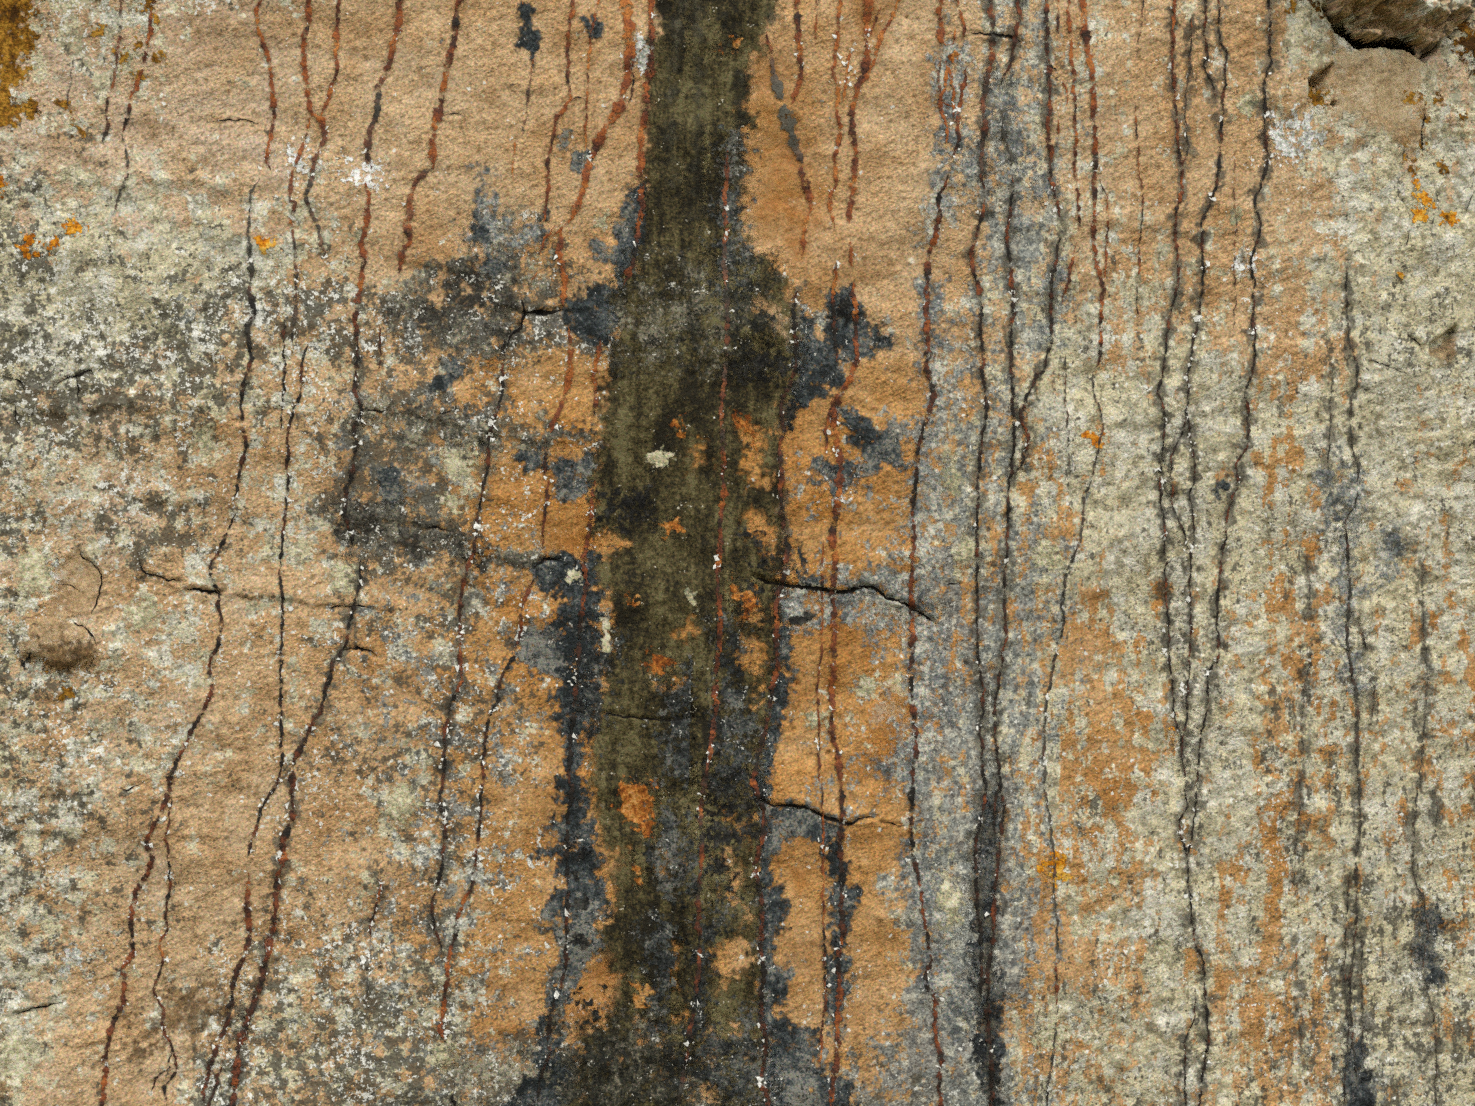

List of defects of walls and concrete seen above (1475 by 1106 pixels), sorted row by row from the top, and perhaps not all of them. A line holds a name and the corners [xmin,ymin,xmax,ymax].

rust [398,0,462,274]
rust [532,0,656,306]
rust [766,0,900,255]
rust [540,329,602,548]
crack [60,550,102,643]
crack [140,564,249,599]
crack [345,645,373,653]
leakage [124,0,1072,1106]
rust [814,242,862,1106]
crack [753,575,935,623]
crack [761,798,906,827]